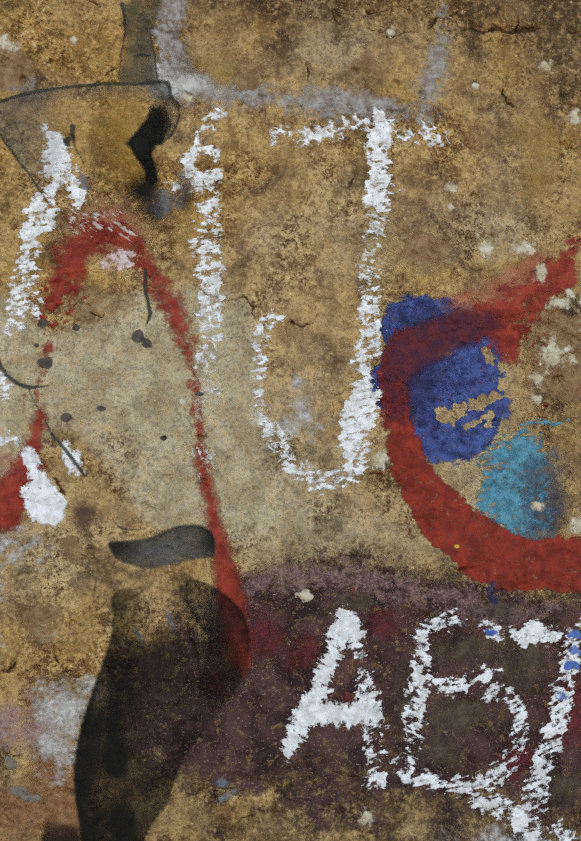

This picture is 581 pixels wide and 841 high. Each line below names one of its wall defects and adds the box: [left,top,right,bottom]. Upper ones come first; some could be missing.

crack [471,22,540,35]